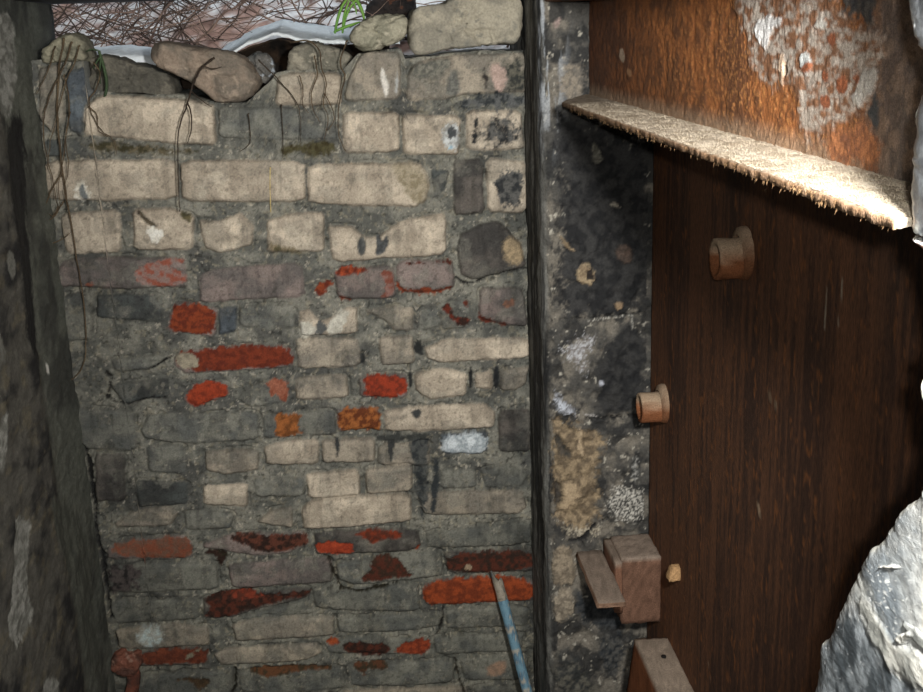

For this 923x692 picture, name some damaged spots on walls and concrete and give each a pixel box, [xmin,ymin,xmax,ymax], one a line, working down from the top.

corrosion [822,115,886,174]